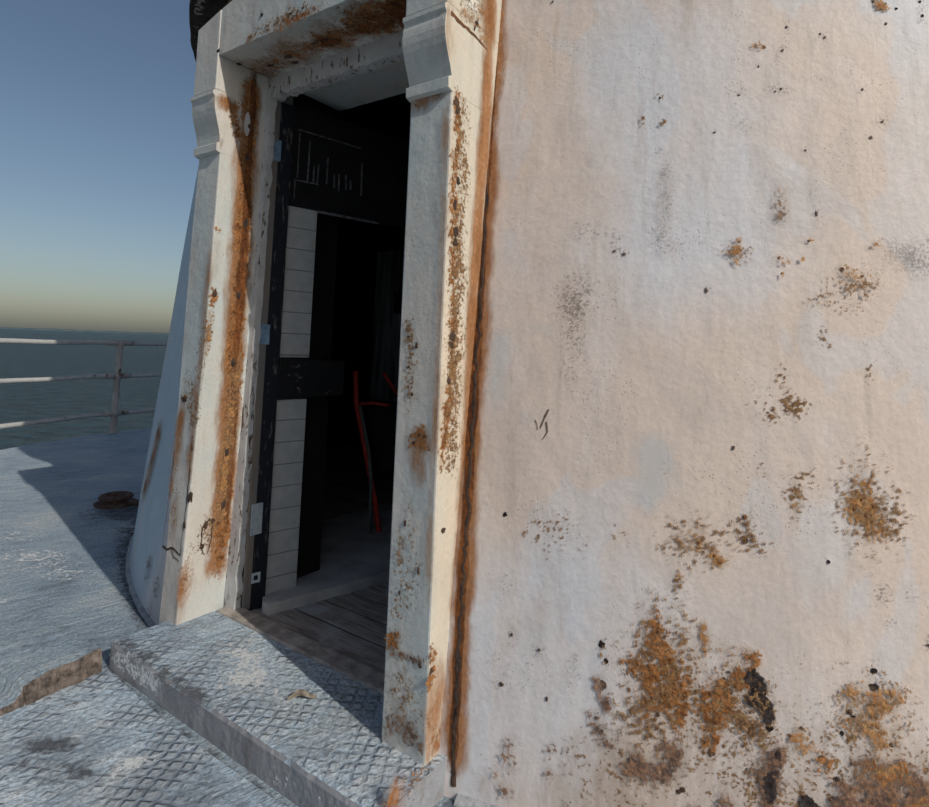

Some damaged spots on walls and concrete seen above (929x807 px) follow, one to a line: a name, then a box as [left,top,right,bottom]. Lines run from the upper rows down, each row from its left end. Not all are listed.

corrosion [872,0,898,11]
corrosion [720,237,754,265]
corrosion [168,0,407,579]
corrosion [808,264,884,312]
corrosion [408,375,439,473]
corrosion [425,0,505,774]
corrosion [747,364,812,426]
corrosion [782,468,815,521]
corrosion [830,445,916,560]
corrosion [523,510,580,560]
corrosion [547,514,929,807]
corrosion [490,738,517,799]